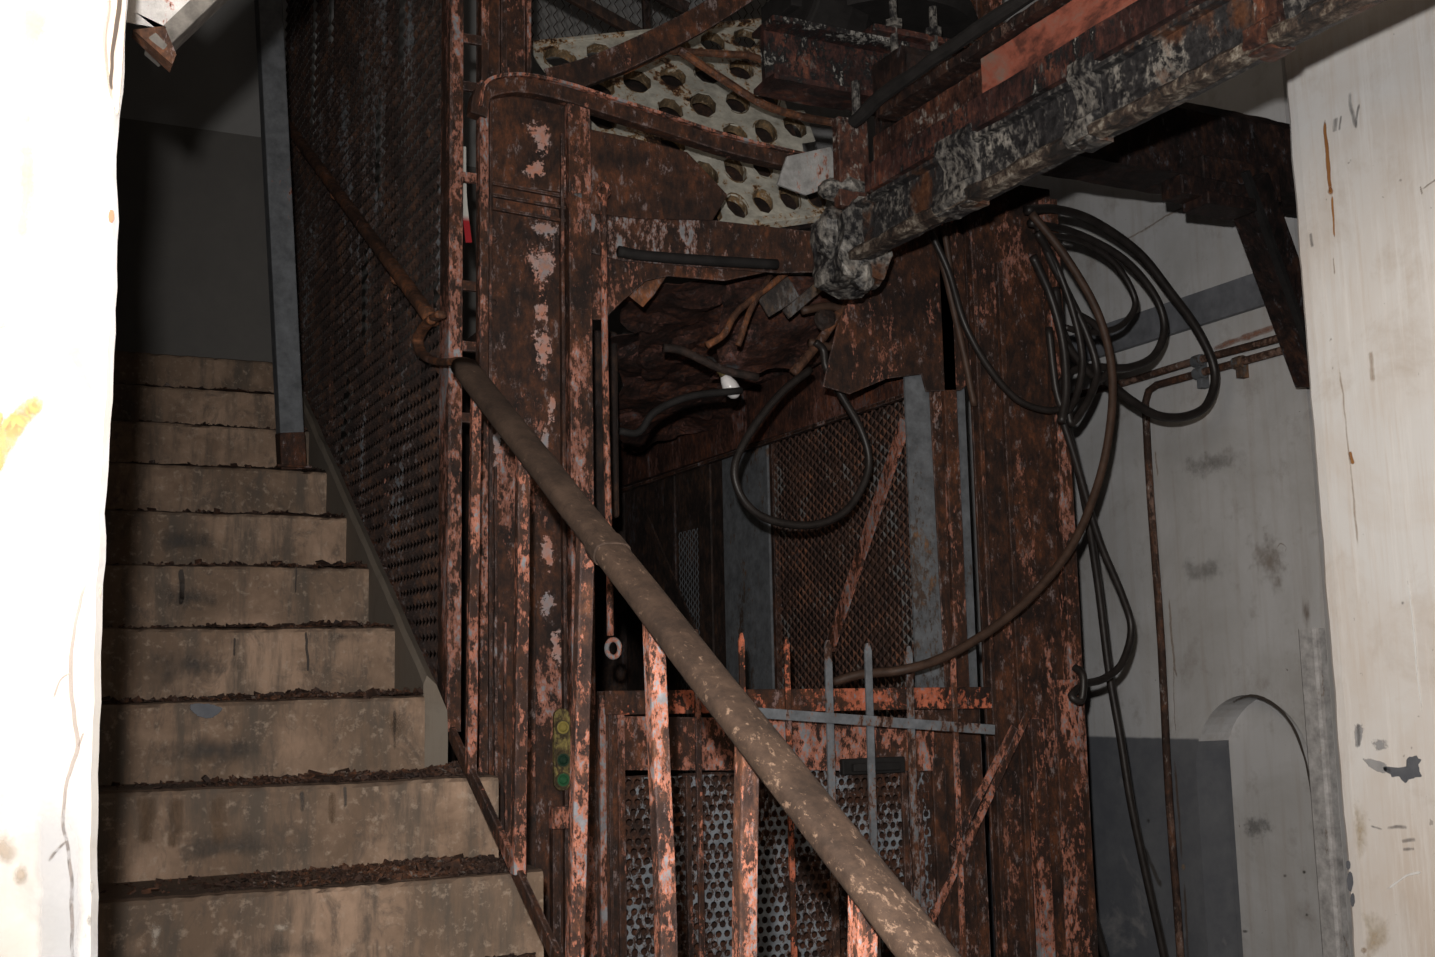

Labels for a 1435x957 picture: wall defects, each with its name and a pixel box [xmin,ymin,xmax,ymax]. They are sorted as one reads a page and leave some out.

rust [1323,123,1335,236]
peeling [1354,725,1422,783]